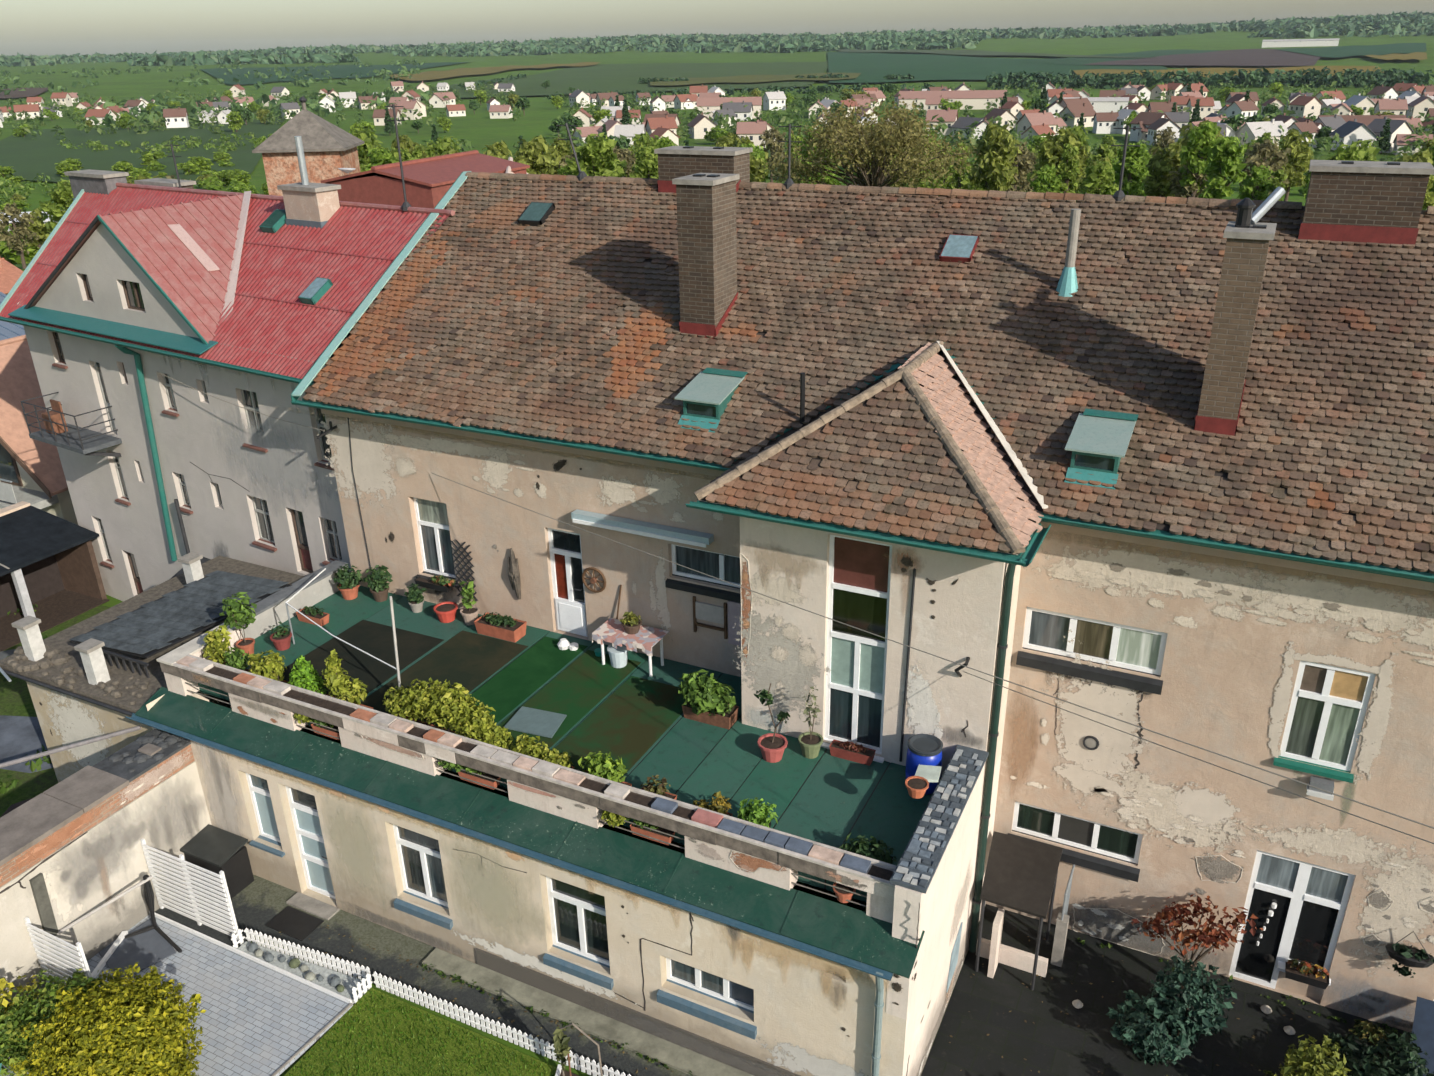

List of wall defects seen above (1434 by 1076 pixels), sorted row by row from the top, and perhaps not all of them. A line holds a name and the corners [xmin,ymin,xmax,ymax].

peeling [362,433,582,502]
peeling [596,471,686,523]
peeling [1024,539,1434,784]
crack [1133,691,1144,769]
crack [0,832,88,894]
flaking render [689,838,786,873]
peeling [1010,761,1434,977]
crack [614,912,694,1011]